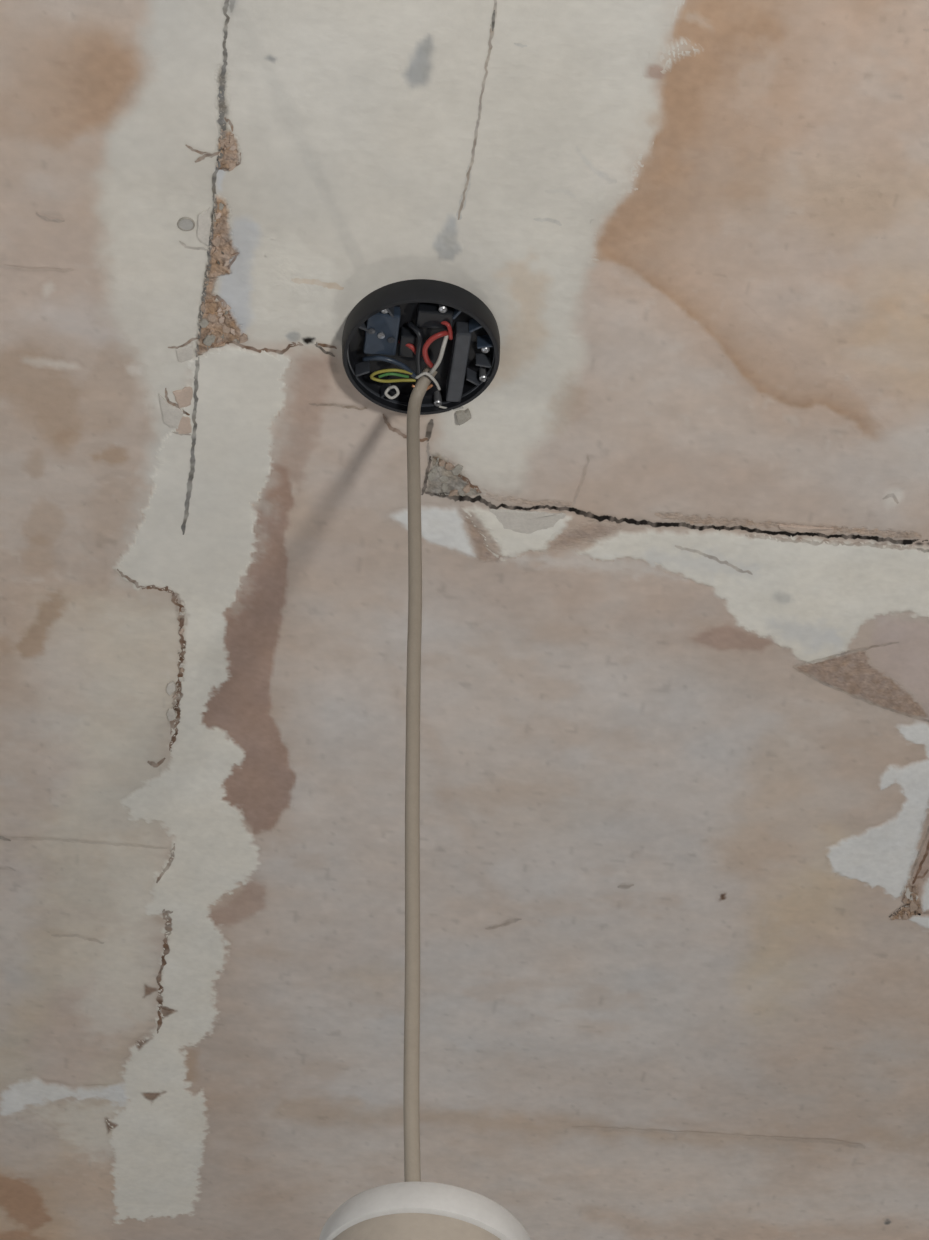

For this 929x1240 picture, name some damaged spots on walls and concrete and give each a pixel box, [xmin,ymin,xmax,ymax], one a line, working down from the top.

crack [159,0,337,535]
leakage [587,0,929,446]
leakage [532,365,596,444]
crack [309,403,929,566]
crack [117,569,187,768]
leakage [203,350,339,837]
peeling [0,0,704,1226]
peeling [421,502,929,934]
crack [0,836,175,1033]
leakage [212,874,271,930]
crack [906,801,929,892]
leakage [0,1117,92,1240]